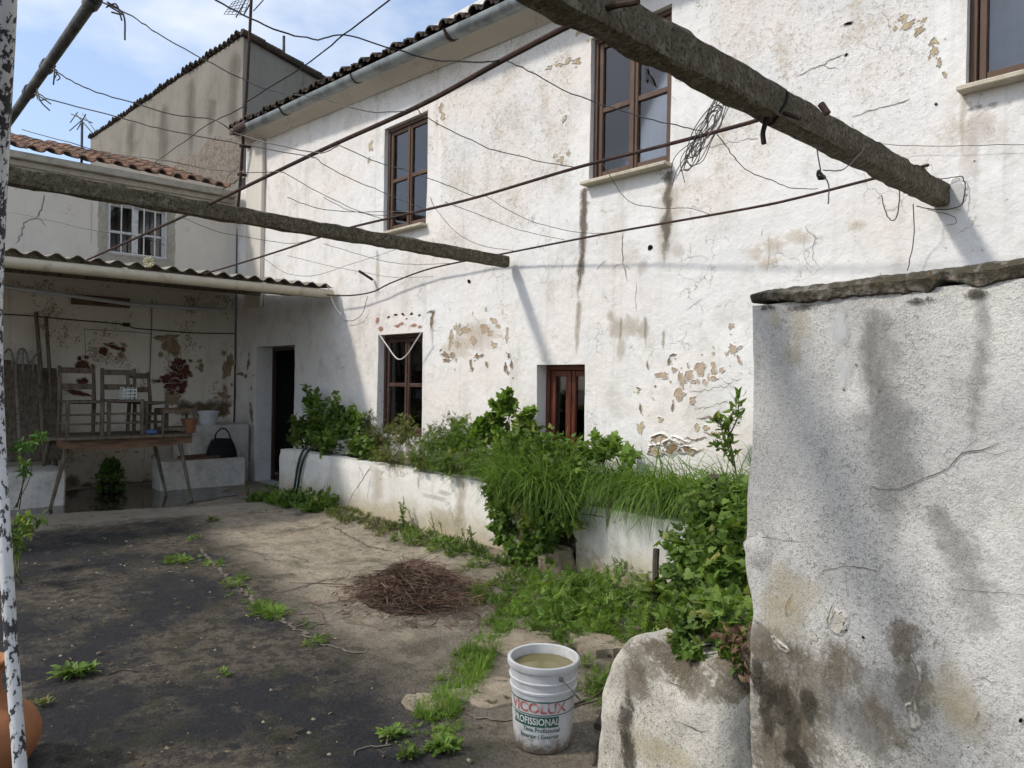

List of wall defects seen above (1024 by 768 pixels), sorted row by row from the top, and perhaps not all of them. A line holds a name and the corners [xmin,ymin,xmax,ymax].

peeling [893,6,947,78]
water stain [577,188,587,288]
water stain [661,171,673,244]
flaking render [62,342,128,397]
flaking render [151,334,204,407]
peeling [386,309,435,328]
peeling [440,306,514,379]
flaking render [634,322,744,459]
crack [862,437,1019,490]
water stain [617,622,909,768]
water stain [883,618,936,720]